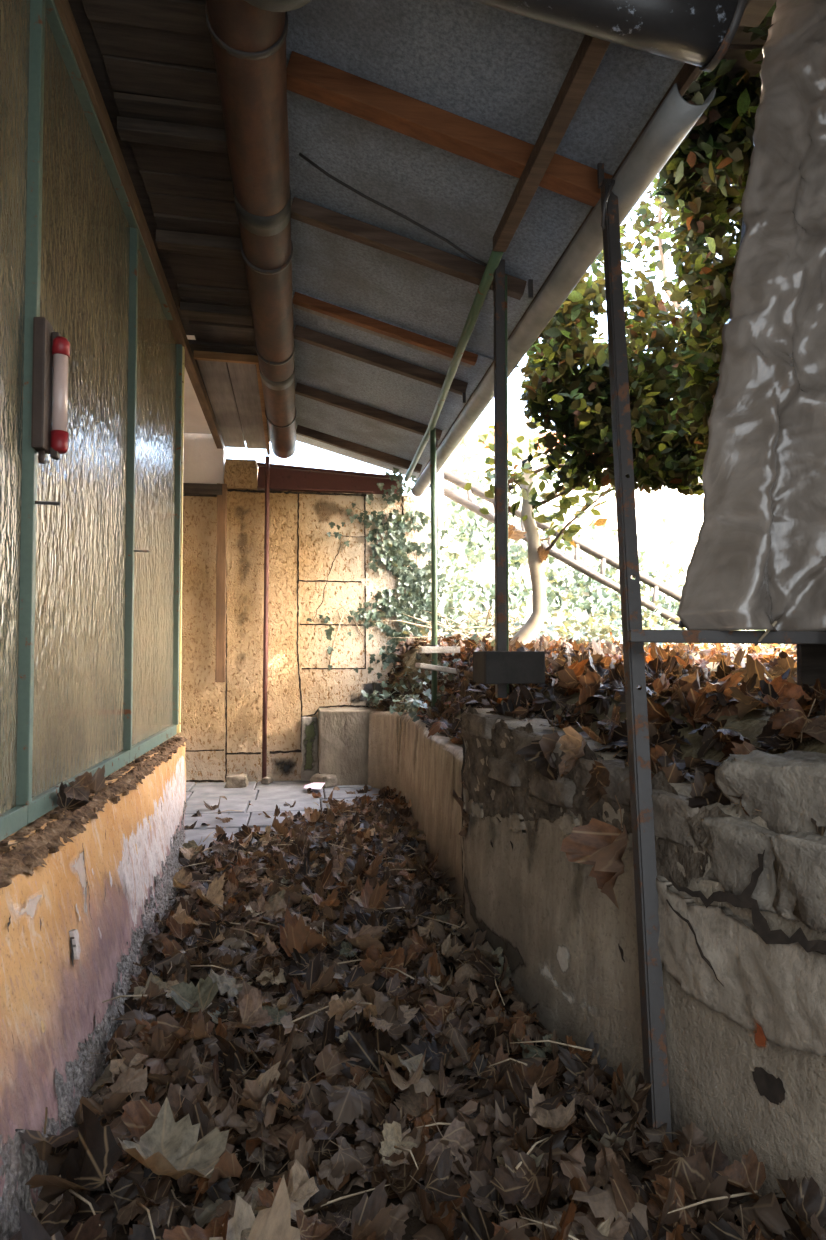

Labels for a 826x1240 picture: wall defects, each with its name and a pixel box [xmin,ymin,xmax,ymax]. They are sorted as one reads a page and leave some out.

spalling [461,705,633,852]
spalling [651,770,732,893]
crack [666,834,826,987]
spalling [0,735,188,1240]